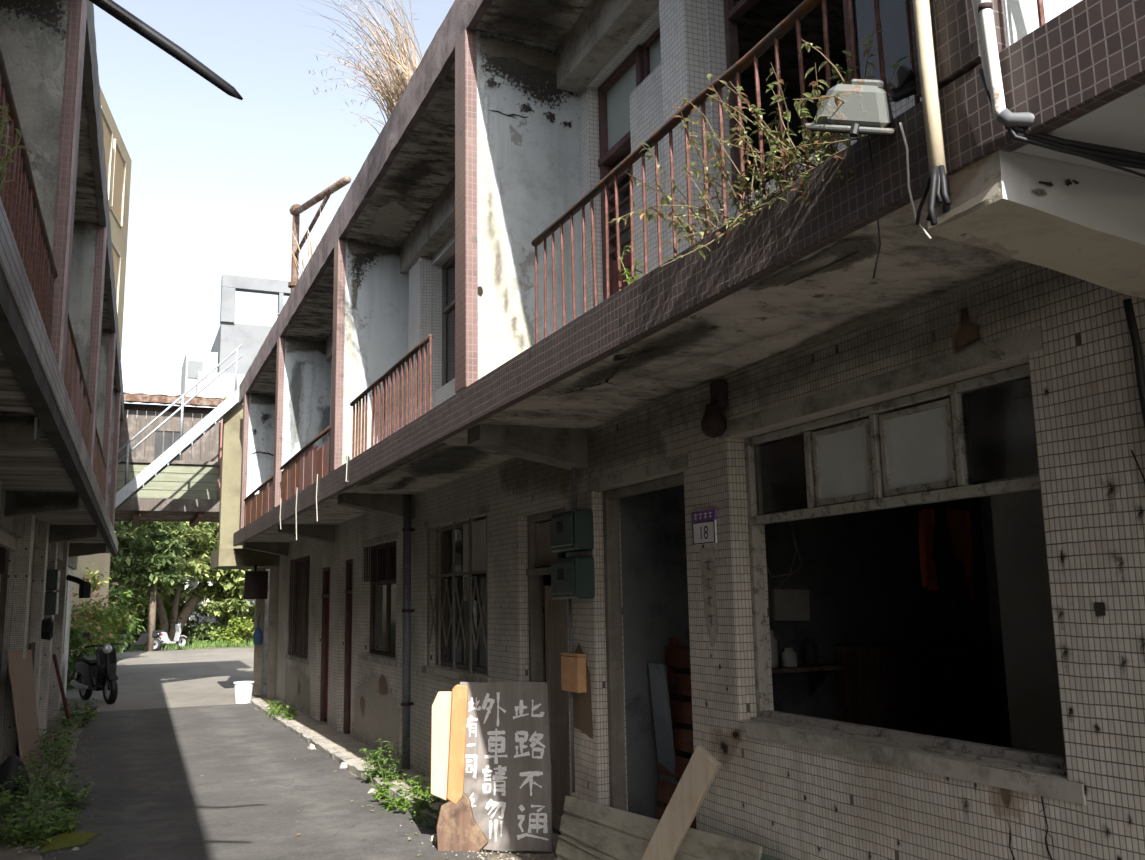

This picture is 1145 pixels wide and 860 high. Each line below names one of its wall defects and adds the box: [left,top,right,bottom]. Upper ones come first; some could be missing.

mould [0,0,69,40]
water stain [476,0,578,379]
water stain [286,239,400,464]
water stain [251,393,276,434]
crack [1007,820,1015,860]
crack [1040,796,1054,860]